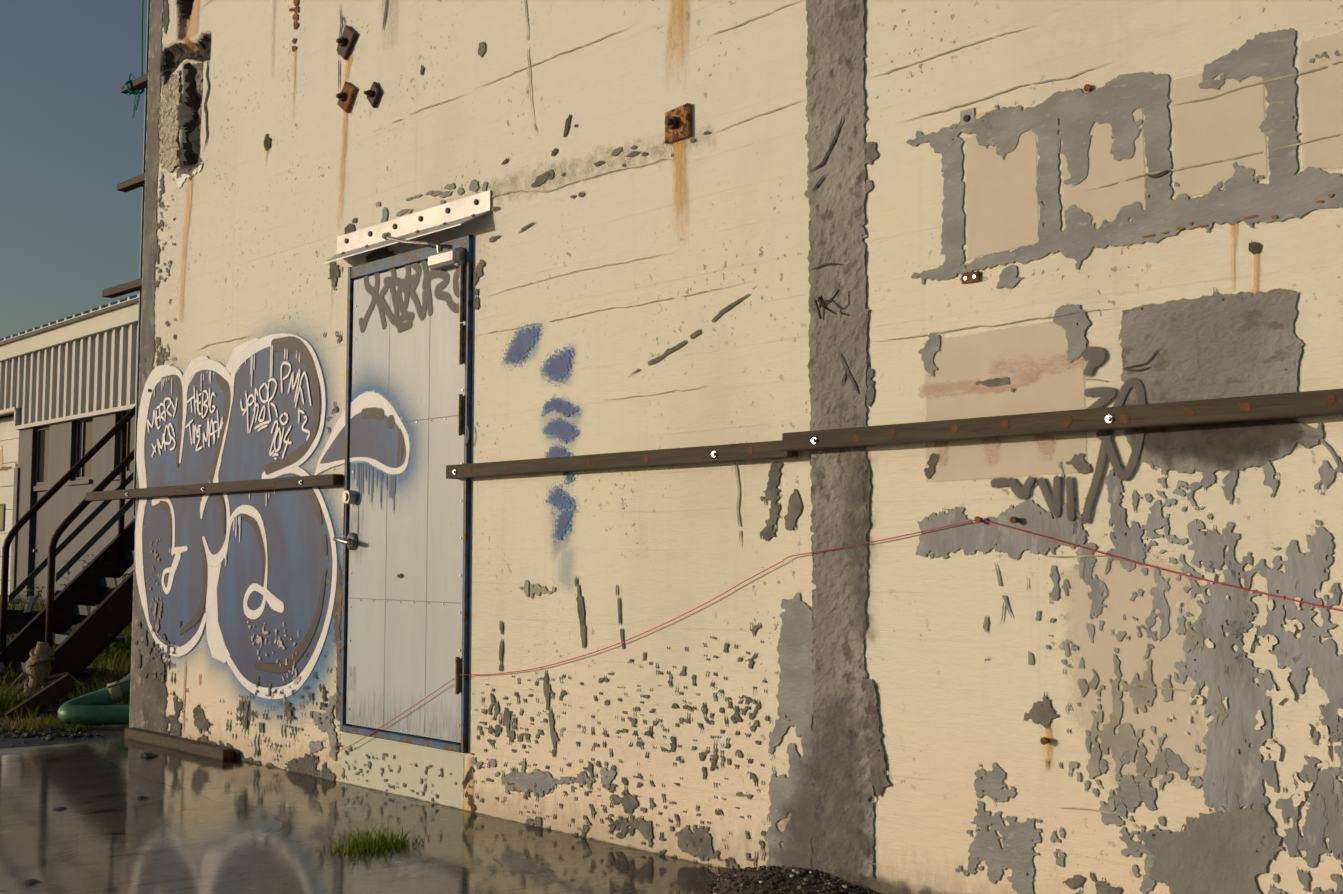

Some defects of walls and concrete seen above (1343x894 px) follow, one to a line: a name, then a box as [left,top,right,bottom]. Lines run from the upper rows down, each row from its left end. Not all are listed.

peeling [531,114,577,187]
peeling [593,145,647,167]
corrosion [674,139,684,200]
peeling [138,0,212,420]
peeling [372,179,487,226]
peeling [804,0,878,431]
peeling [328,261,341,290]
peeling [365,246,394,262]
peeling [473,259,485,310]
peeling [129,447,890,879]
peeling [916,418,1343,894]